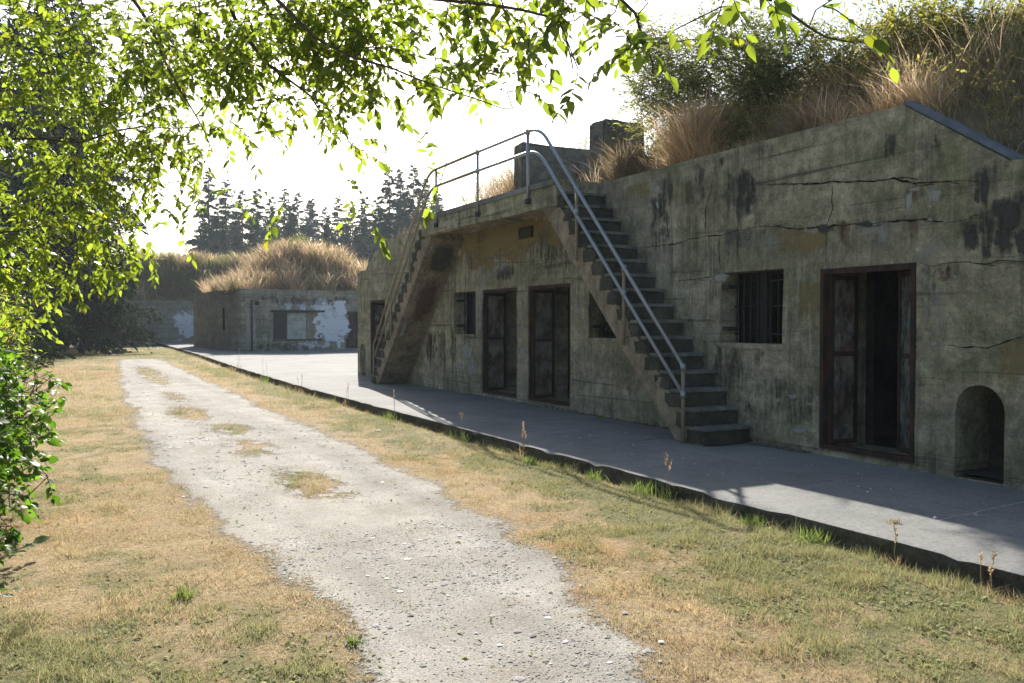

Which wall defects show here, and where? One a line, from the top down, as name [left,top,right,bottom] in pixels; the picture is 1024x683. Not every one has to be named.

leakage [623,166,704,248]
leakage [720,158,828,255]
crack [641,177,986,281]
crack [920,259,1022,267]
peeling [172,310,194,340]
peeling [285,298,351,349]
crack [951,337,1021,349]